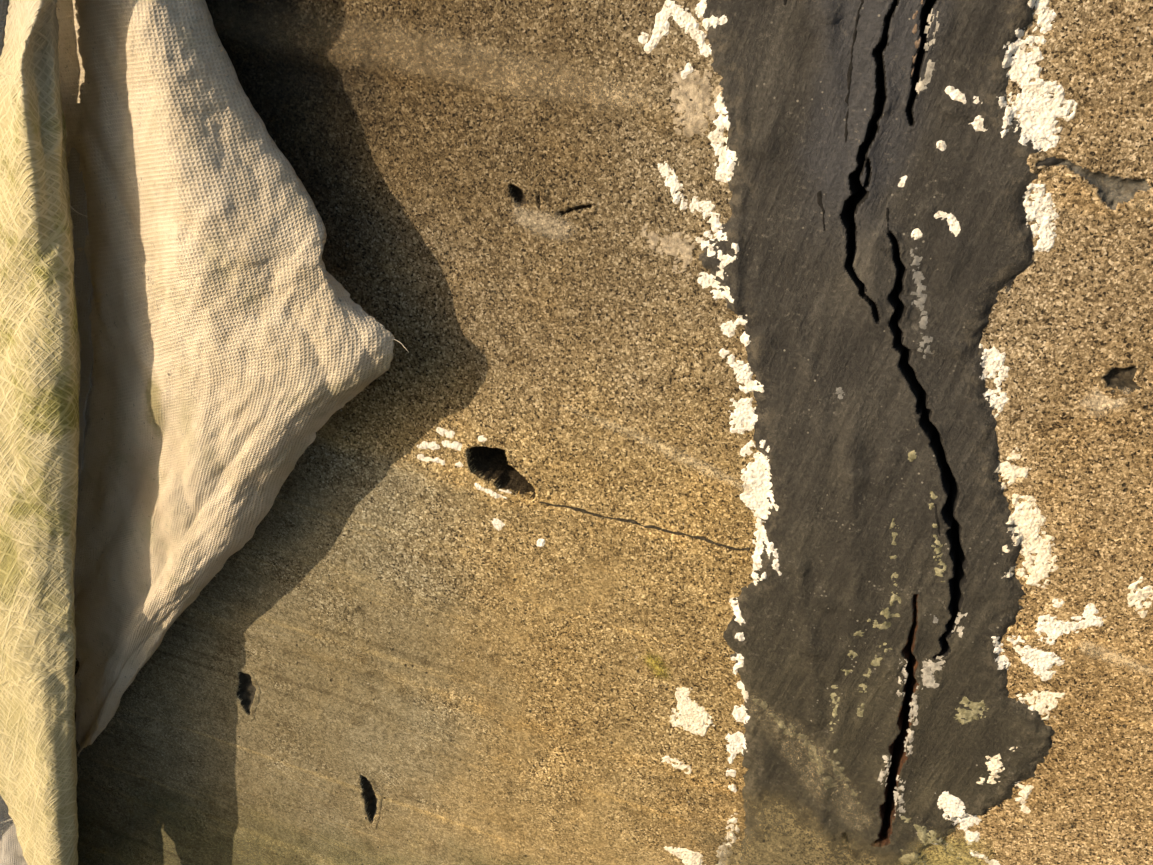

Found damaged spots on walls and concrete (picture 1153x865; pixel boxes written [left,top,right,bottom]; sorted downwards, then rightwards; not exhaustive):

water stain [915,8,939,94]
peeling [998,0,1153,252]
spalling [1083,358,1153,411]
spalling [416,427,541,507]
crack [817,0,972,859]
crack [539,502,750,551]
water stain [952,612,968,638]
spalling [233,666,261,721]
water stain [877,656,946,816]
spalling [354,770,383,830]